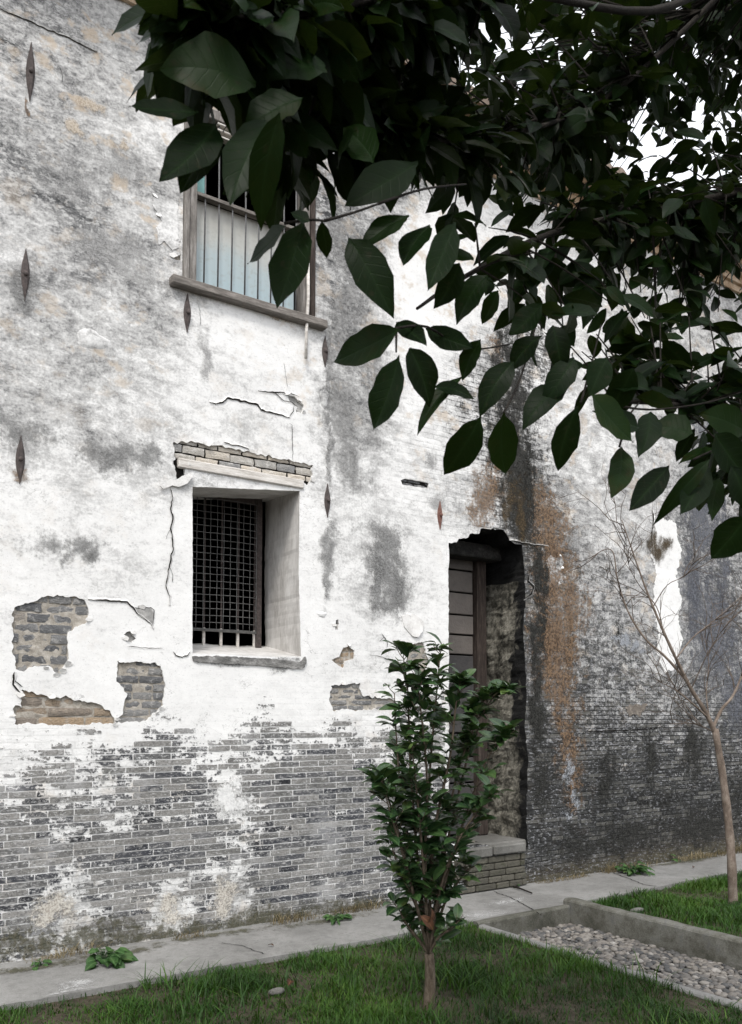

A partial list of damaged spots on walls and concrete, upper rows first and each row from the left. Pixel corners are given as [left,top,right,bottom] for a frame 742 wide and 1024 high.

crack [0,8,131,66]
leakage [75,441,162,471]
crack [210,365,299,458]
crack [88,486,190,657]
leakage [365,524,410,613]
leakage [483,324,558,826]
flaking render [12,595,93,677]
flaking render [332,644,354,668]
peeling [0,659,445,962]
leakage [538,709,742,867]